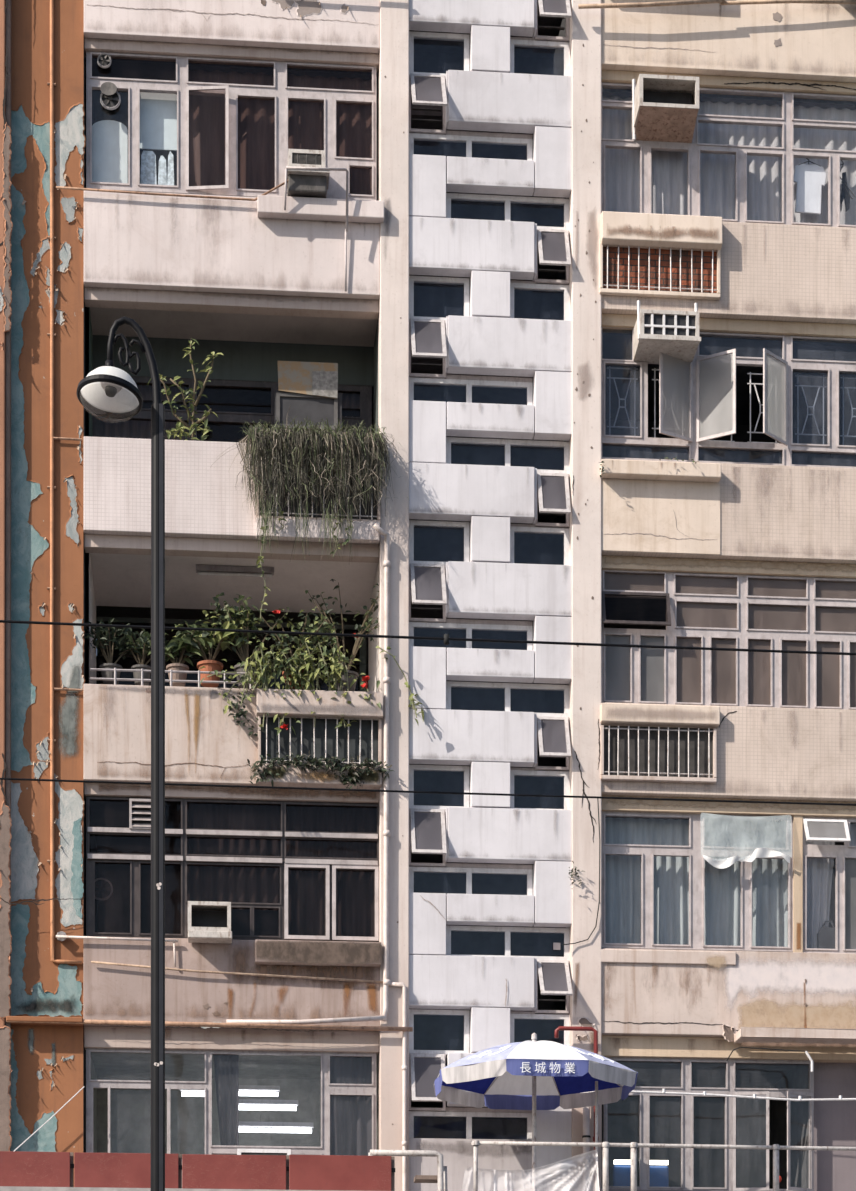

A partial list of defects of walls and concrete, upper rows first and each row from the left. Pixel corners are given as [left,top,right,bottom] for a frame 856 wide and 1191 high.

peeling [261,0,323,19]
crack [611,509,715,540]
peeling [0,102,86,1152]
rust [185,693,199,748]
rust [368,985,376,1011]